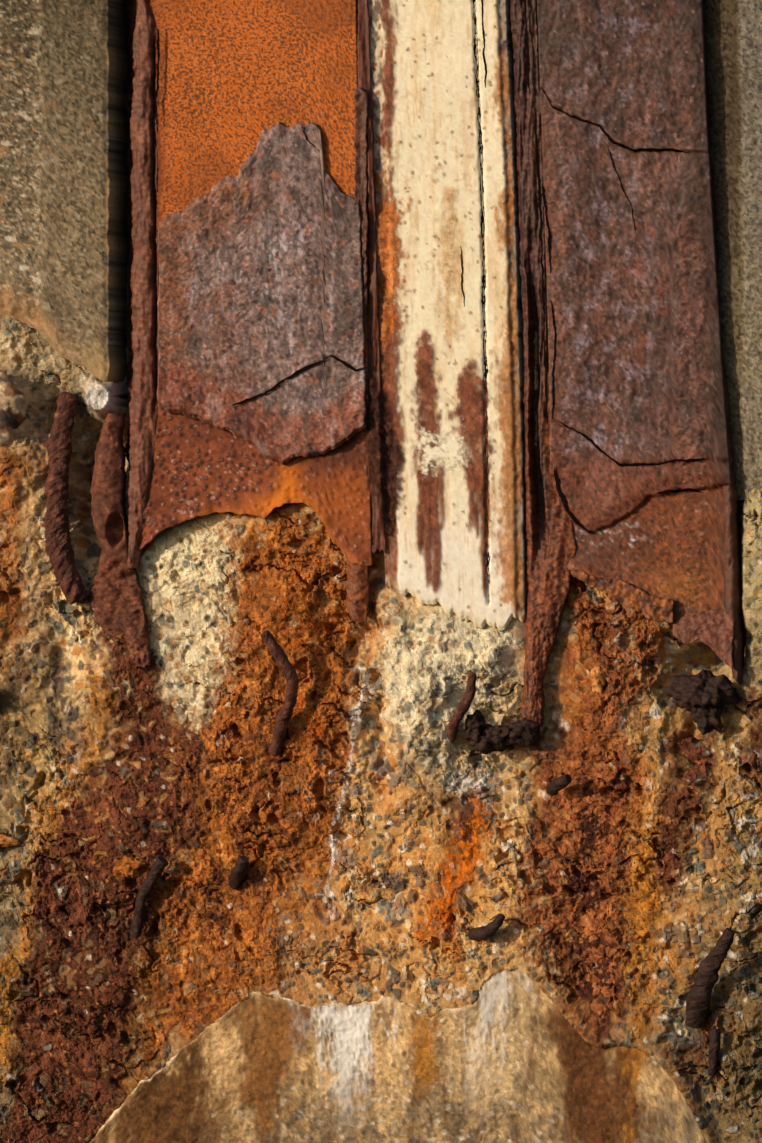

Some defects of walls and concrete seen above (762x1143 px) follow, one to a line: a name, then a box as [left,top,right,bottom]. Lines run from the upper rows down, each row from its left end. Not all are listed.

spalling [0,321,91,604]
spalling [138,519,237,730]
rust [0,503,385,1143]
crack [233,355,365,405]
rust [157,0,523,616]
spalling [380,606,523,773]
rust [415,792,492,950]
crack [460,0,489,463]
crack [554,466,591,533]
crack [524,0,705,493]
rust [514,568,762,1143]
spalling [742,491,762,673]